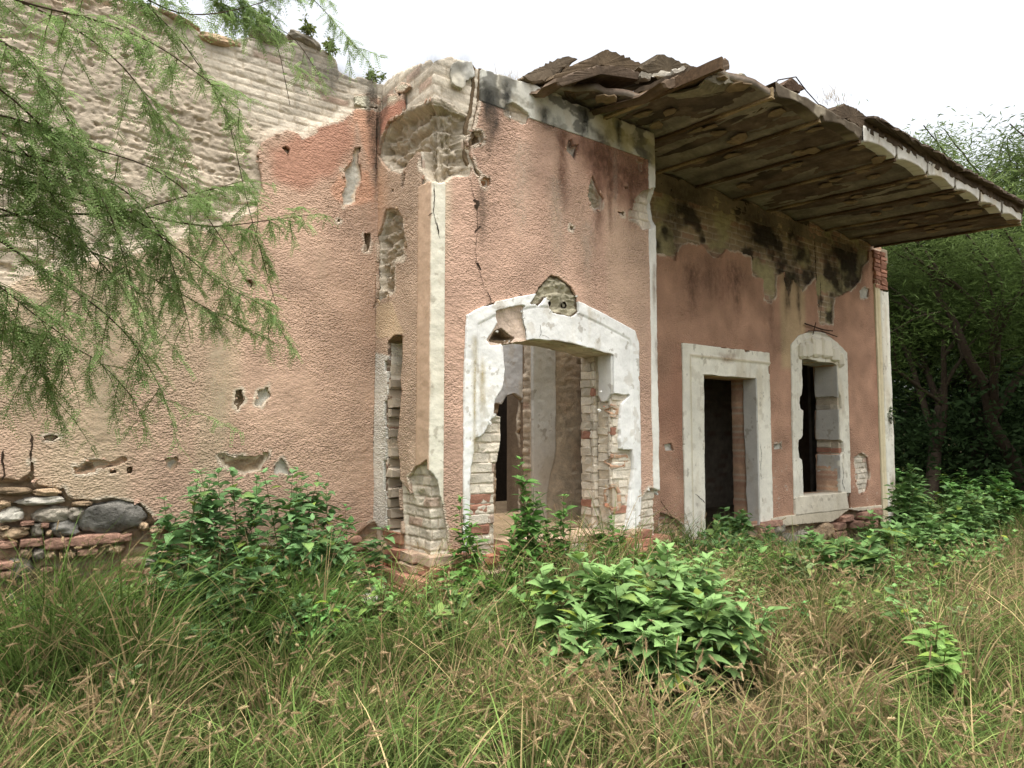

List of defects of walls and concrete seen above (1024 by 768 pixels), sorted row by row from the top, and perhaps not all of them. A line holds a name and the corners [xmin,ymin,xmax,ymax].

damp [485,83,509,140]
peeling [0,0,490,286]
crack [462,64,498,326]
flaking render [588,179,602,211]
flaking render [364,206,407,304]
peeling [618,173,868,325]
flaking render [487,275,578,346]
flaking render [234,388,270,410]
flaking render [73,457,135,474]
flaking render [218,450,290,475]
flaking render [854,453,868,494]